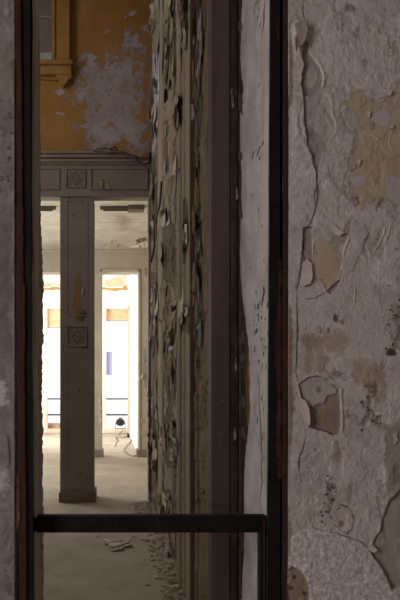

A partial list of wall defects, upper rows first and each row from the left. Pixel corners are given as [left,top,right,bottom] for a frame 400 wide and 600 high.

crack [294,5,308,128]
peeling [302,42,400,212]
peeling [56,0,206,514]
peeling [297,216,352,299]
flaking render [299,374,343,435]
flaking render [371,425,400,590]
flaking render [288,567,309,600]